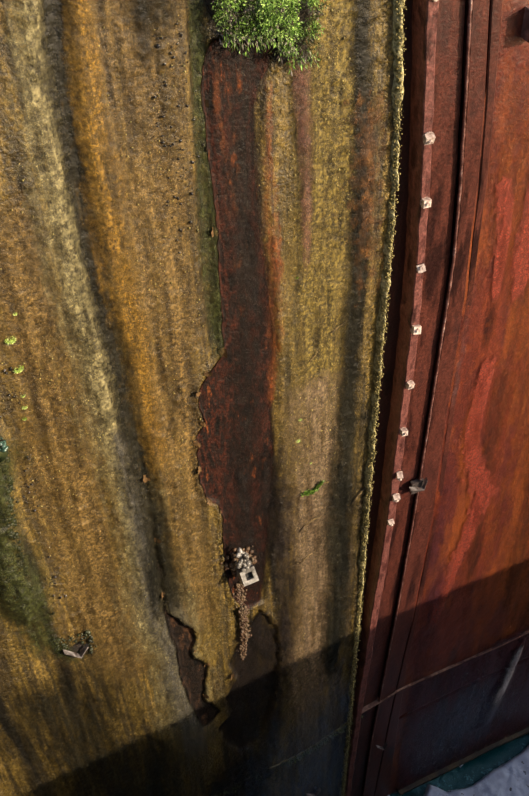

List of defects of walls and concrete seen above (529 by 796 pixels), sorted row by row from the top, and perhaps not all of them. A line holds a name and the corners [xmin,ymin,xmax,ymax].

water stain [0,0,376,796]
peeling [165,29,279,753]